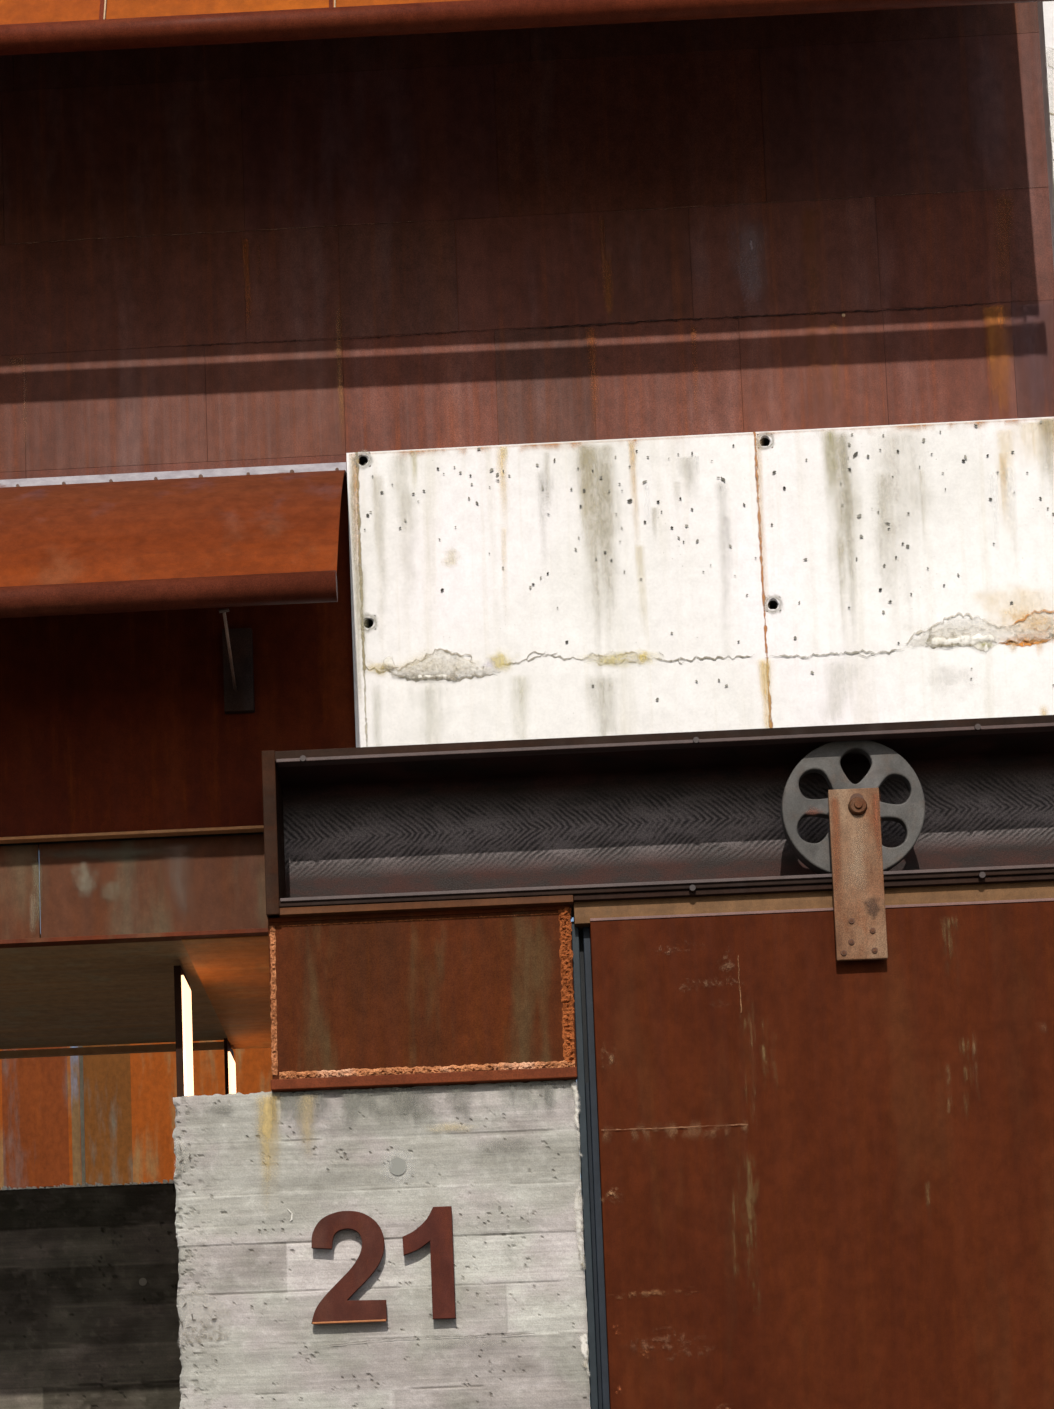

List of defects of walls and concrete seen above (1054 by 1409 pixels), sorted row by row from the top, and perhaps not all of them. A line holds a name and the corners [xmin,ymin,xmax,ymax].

spalling [906,609,1054,652]
rust [1002,617,1046,647]
crack [364,667,416,680]
spalling [382,648,505,682]
crack [505,651,583,665]
crack [656,649,904,664]